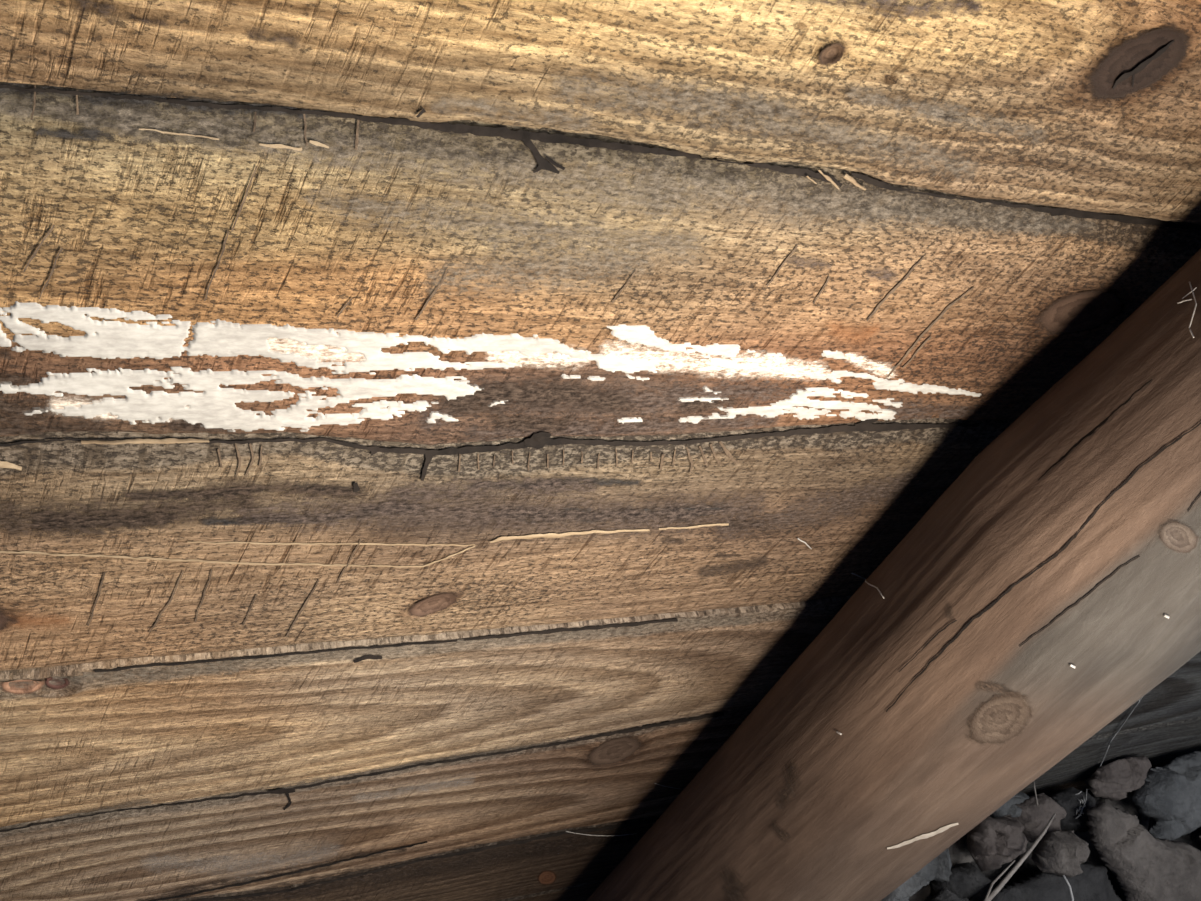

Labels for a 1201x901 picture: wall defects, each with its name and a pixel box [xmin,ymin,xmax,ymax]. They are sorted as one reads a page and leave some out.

peeling [0,301,981,432]